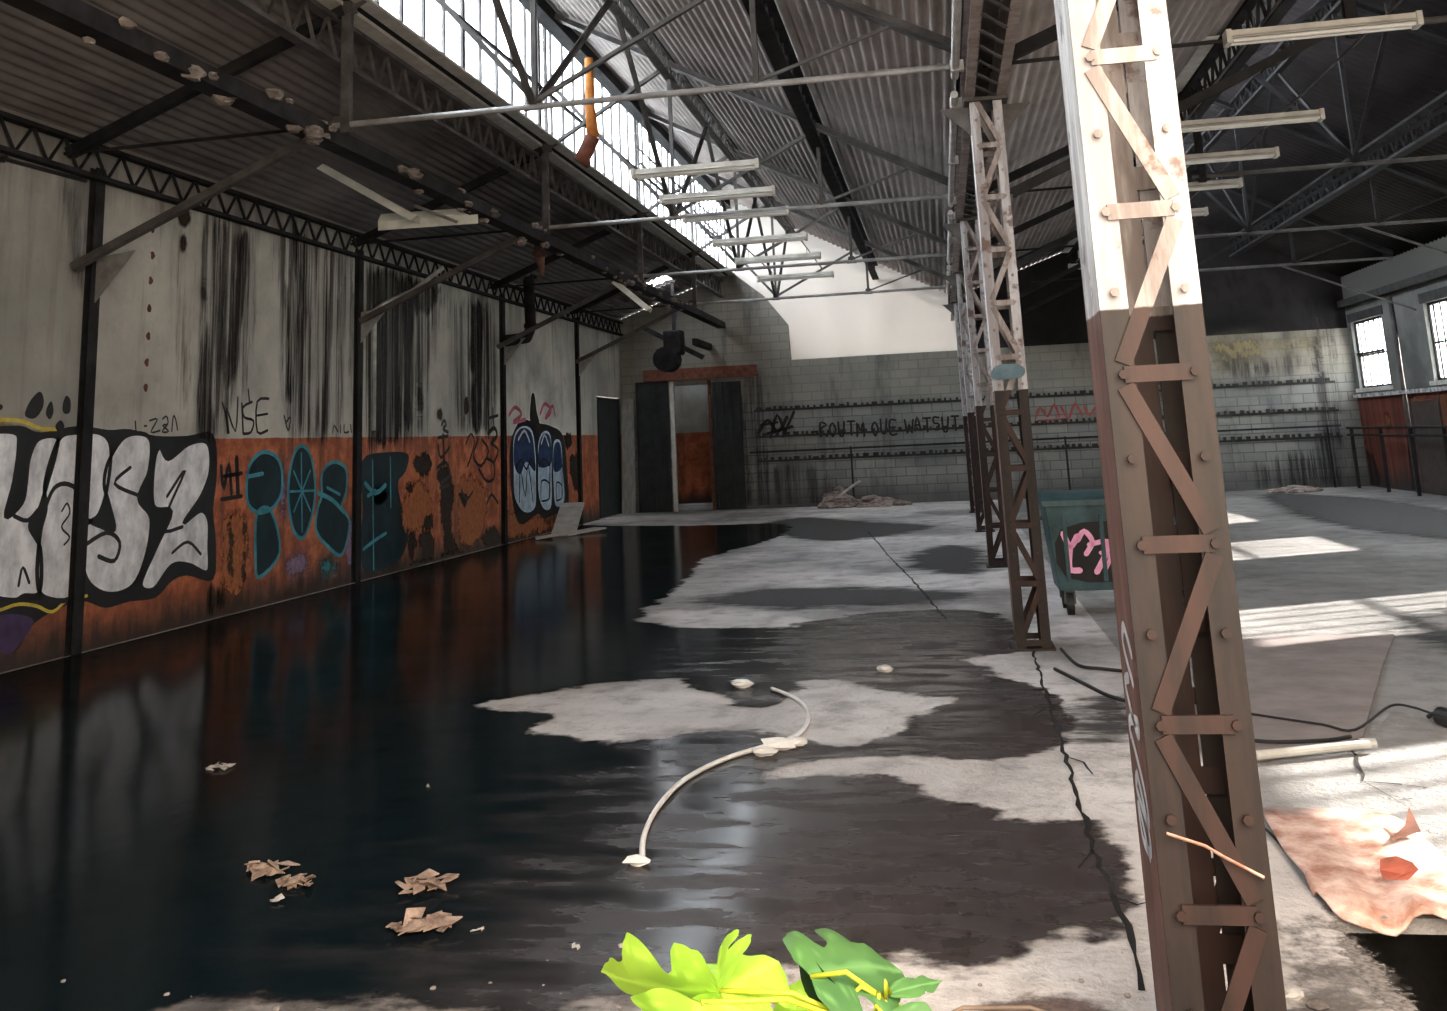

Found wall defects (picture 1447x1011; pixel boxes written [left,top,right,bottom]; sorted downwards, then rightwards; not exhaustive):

water stain [178,211,250,442]
water stain [279,226,498,449]
crack [1032,651,1146,991]
water stain [1064,696,1128,743]